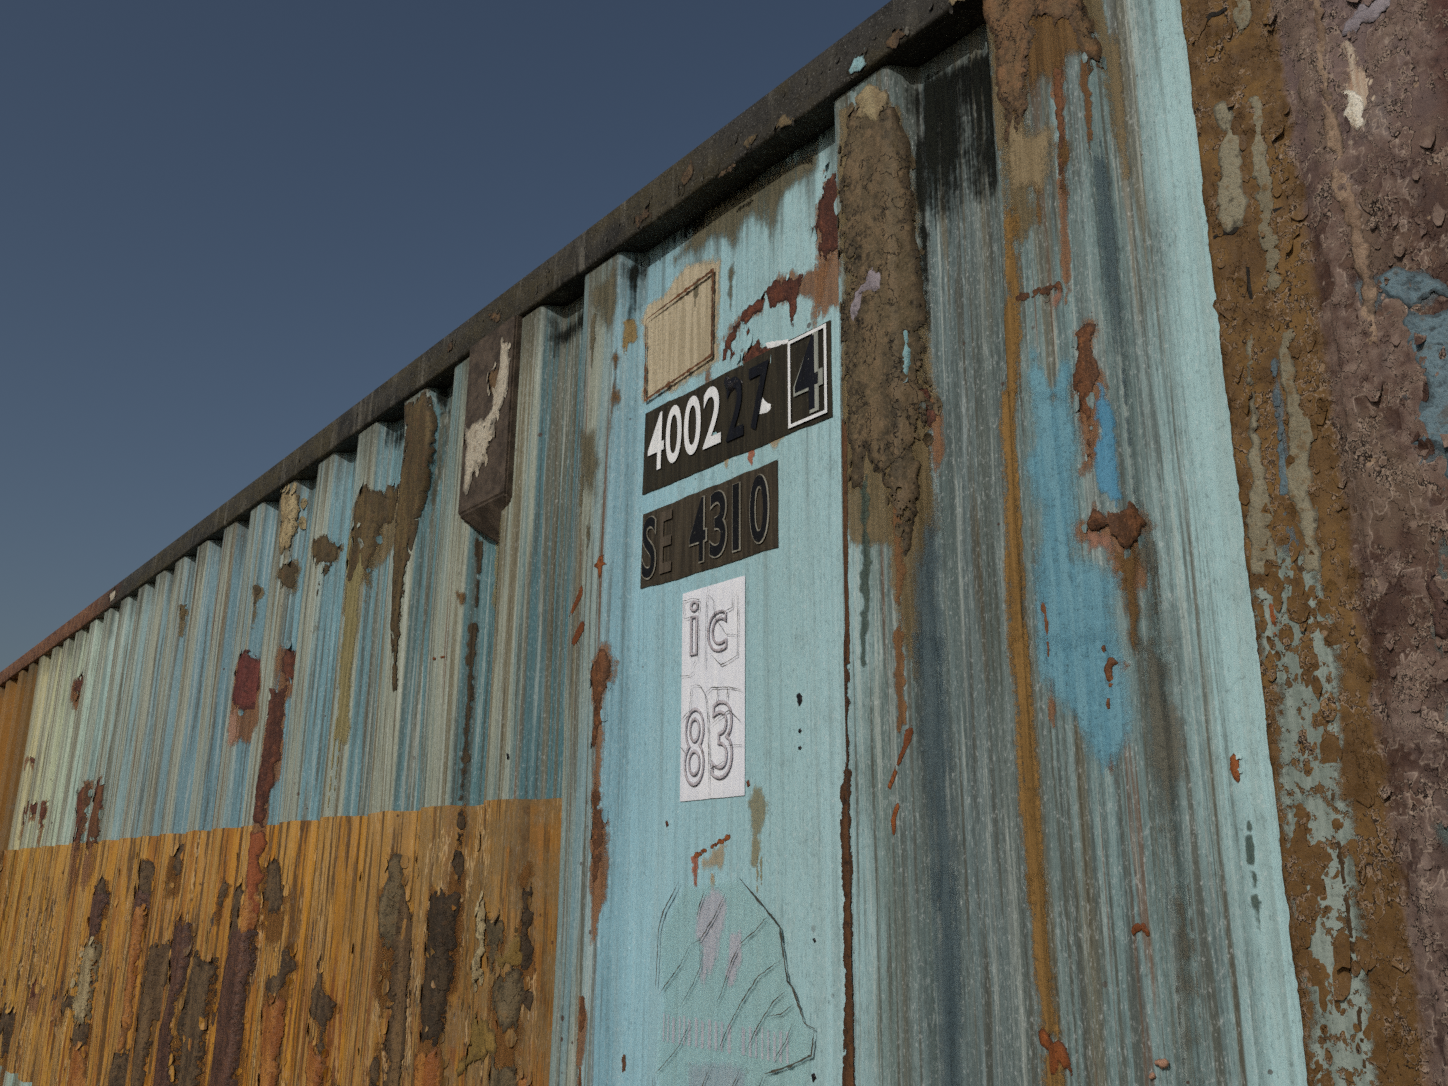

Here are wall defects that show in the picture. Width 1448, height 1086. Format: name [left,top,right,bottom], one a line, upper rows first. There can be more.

corrosion [705,158,841,383]
peeling [1305,0,1448,490]
corrosion [252,477,400,808]
peeling [462,307,511,495]
corrosion [1073,500,1152,709]
peeling [1231,311,1349,681]
corrosion [228,637,296,931]
corrosion [588,643,618,941]
corrosion [413,1047,449,1086]
peeling [1298,913,1316,948]
peeling [1320,1047,1354,1086]
peeling [1319,925,1411,1013]